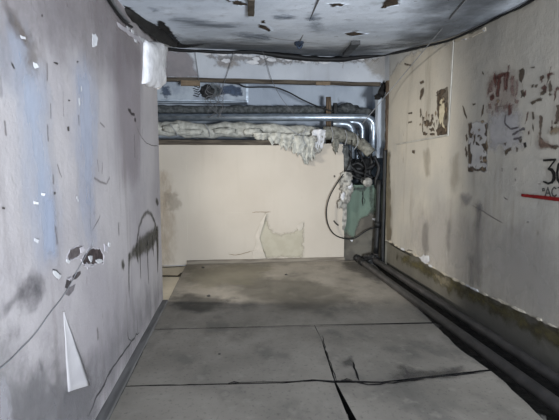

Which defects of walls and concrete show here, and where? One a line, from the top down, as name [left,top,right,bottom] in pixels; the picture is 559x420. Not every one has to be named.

peeling [202,53,331,66]
spalling [53,242,111,296]
damp [396,256,559,347]